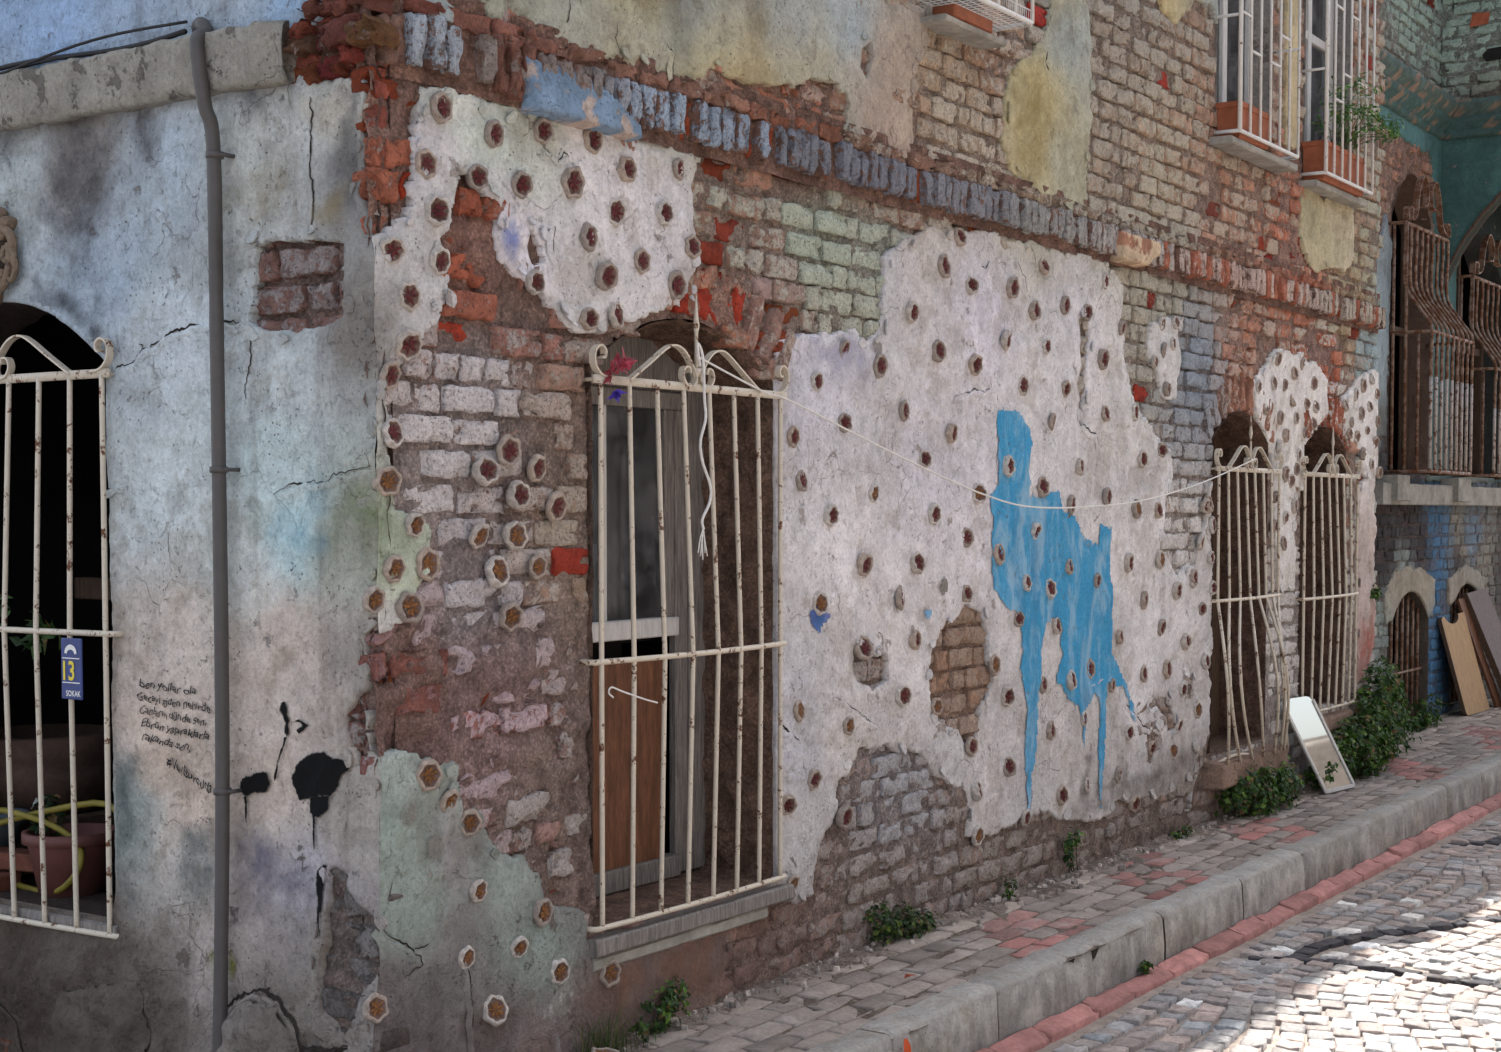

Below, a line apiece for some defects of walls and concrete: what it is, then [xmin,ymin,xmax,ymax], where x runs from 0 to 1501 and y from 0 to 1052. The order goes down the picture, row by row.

crack [302,97,314,234]
spalling [283,0,461,248]
spalling [695,59,851,132]
spalling [884,0,1053,179]
spalling [1064,0,1443,301]
spalling [242,225,355,345]
spalling [1077,307,1095,424]
crack [274,466,374,504]
spalling [344,156,977,939]
spalling [1104,262,1501,763]
spalling [715,473,1317,1002]
spalling [297,845,410,1052]